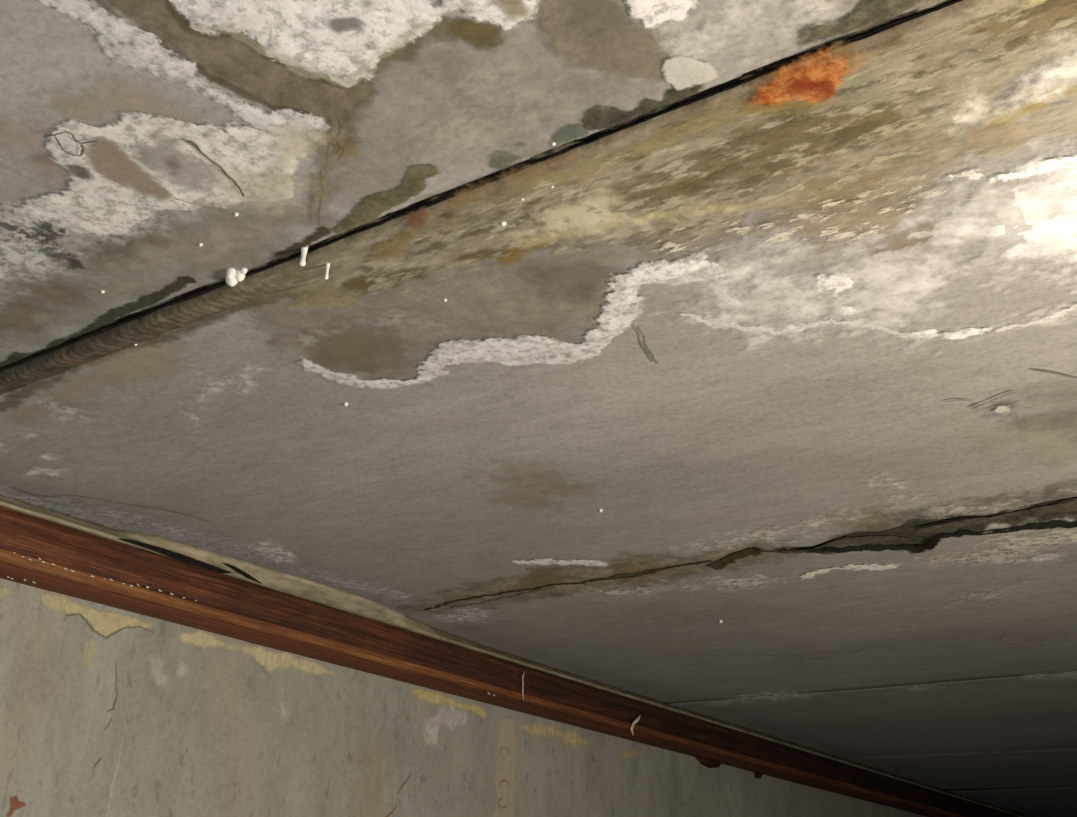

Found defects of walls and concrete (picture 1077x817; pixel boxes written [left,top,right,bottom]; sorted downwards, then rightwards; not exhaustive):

corrosion [750,50,861,112]
crack [0,0,962,373]
damp [0,0,1077,423]
crack [1034,370,1077,379]
damp [27,453,63,476]
damp [1045,488,1077,502]
damp [1,478,1032,623]
crack [425,496,1077,610]
damp [929,528,1077,566]
peeling [42,594,154,666]
peeling [180,631,333,679]
corrosion [8,797,26,817]